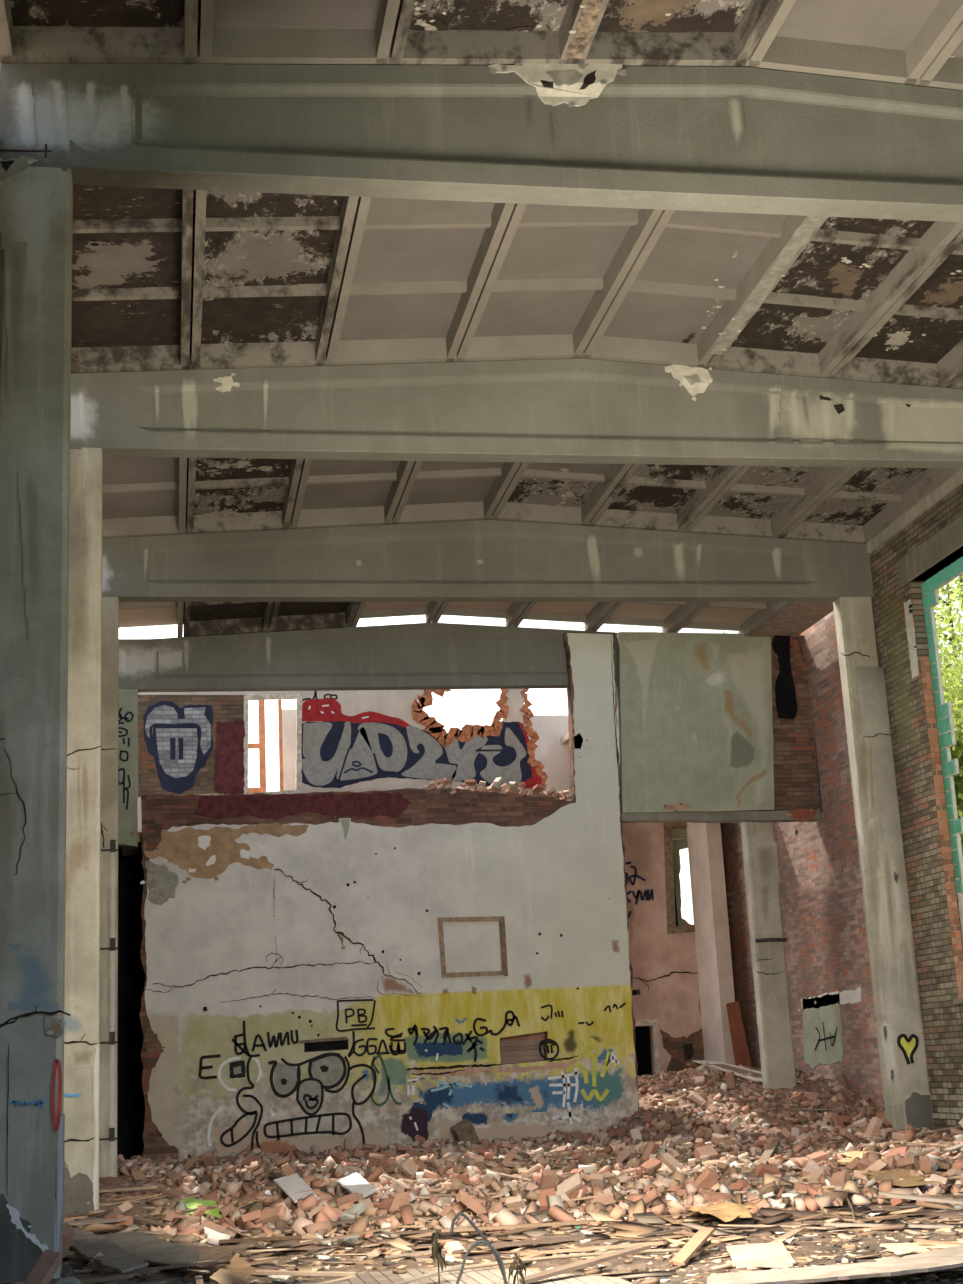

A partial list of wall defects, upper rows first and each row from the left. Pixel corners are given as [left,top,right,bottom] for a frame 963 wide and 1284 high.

peeling [488,0,722,107]
spalling [664,216,828,401]
spalling [411,689,548,786]
crack [0,738,27,876]
flaking render [132,822,309,905]
crack [145,869,424,1002]
crack [0,1006,98,1153]